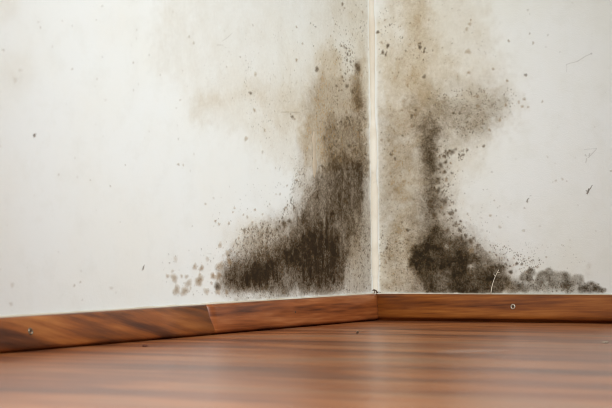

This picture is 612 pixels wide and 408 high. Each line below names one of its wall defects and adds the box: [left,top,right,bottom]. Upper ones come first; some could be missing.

damp [212,77,369,296]
damp [407,115,512,293]